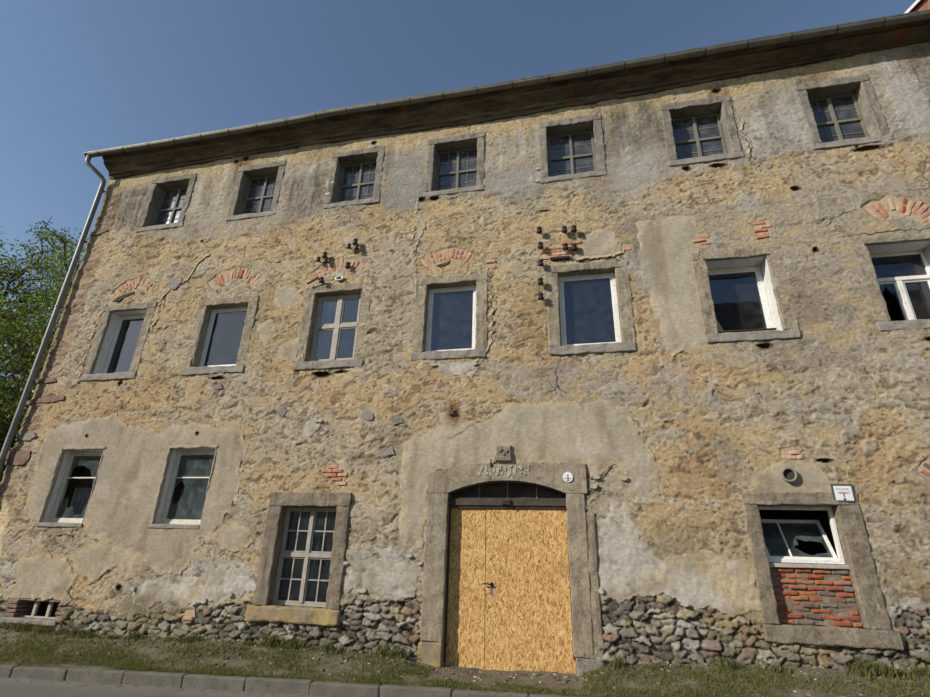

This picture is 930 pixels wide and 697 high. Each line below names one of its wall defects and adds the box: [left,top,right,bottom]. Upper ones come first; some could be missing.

crack [811,209,929,237]
spalling [311,370,348,378]
peeling [590,475,762,617]
crack [66,566,115,600]
peeling [115,563,256,621]